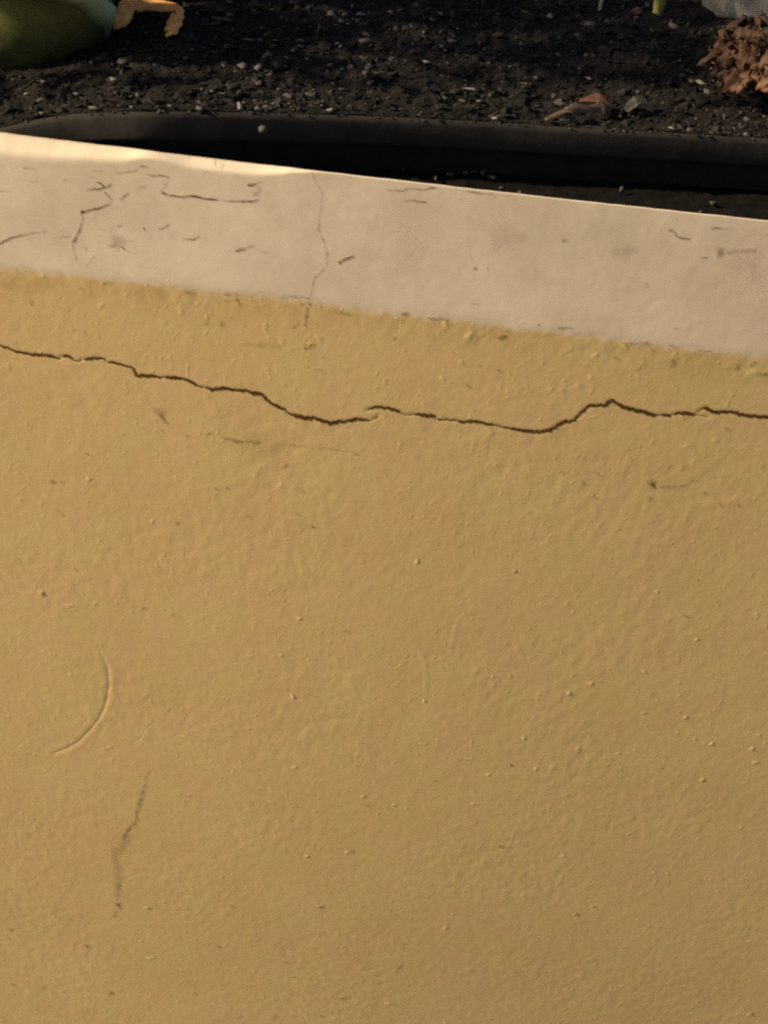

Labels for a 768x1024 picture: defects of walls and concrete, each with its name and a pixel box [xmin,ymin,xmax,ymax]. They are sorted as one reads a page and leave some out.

crack [72,182,111,243]
crack [141,166,258,202]
crack [0,344,768,434]